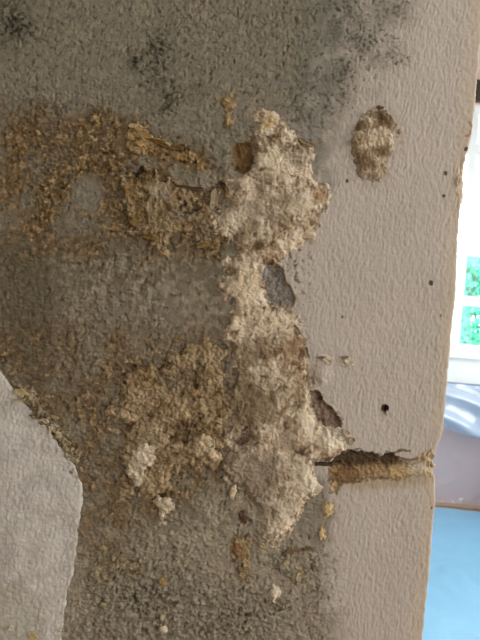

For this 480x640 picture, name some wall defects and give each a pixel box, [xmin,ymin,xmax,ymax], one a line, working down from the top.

flaking render [107,120,231,266]
spalling [231,140,259,175]
damp [0,0,350,640]
spalling [259,262,298,308]
flaking render [102,332,252,501]
flaking render [308,387,436,494]
flaking render [229,500,335,586]